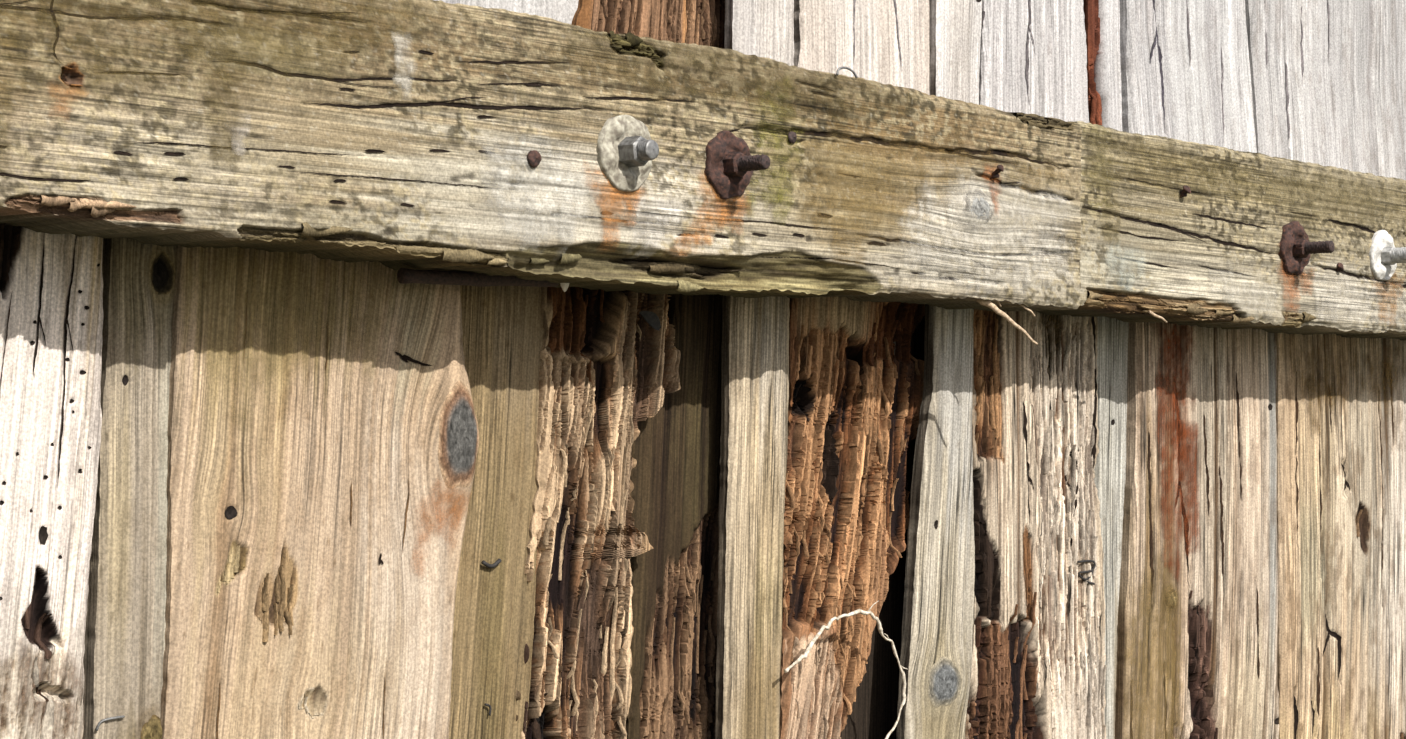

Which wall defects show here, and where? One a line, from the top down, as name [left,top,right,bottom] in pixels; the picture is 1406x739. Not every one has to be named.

crack [0,0,698,207]
crack [850,0,858,58]
crack [894,0,902,67]
crack [1026,0,1036,101]
crack [1150,0,1225,145]
crack [1264,3,1330,149]
crack [550,211,1068,285]
crack [729,127,1406,277]
crack [1311,263,1406,288]
spalling [973,477,1001,620]
spalling [1020,527,1033,621]
spalling [531,693,549,739]